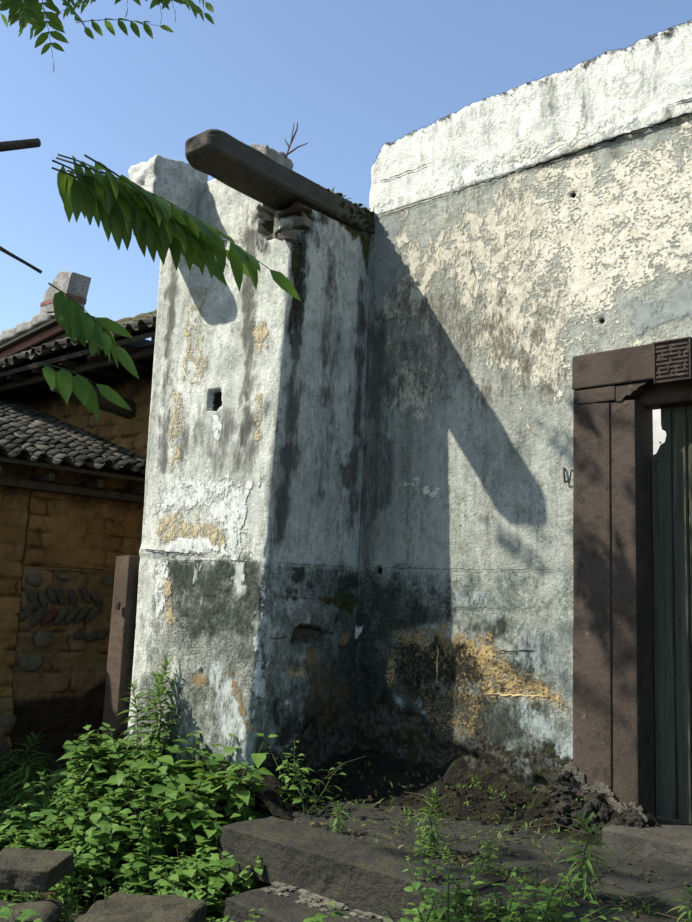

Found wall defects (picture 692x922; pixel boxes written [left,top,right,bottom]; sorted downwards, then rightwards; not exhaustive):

damp [288,212,328,344]
peeling [372,96,692,424]
flaking render [156,506,232,552]
damp [169,556,263,640]
damp [285,566,314,601]
spalling [281,623,363,678]
damp [330,564,573,788]
flaking render [383,622,571,740]
damp [214,696,323,771]